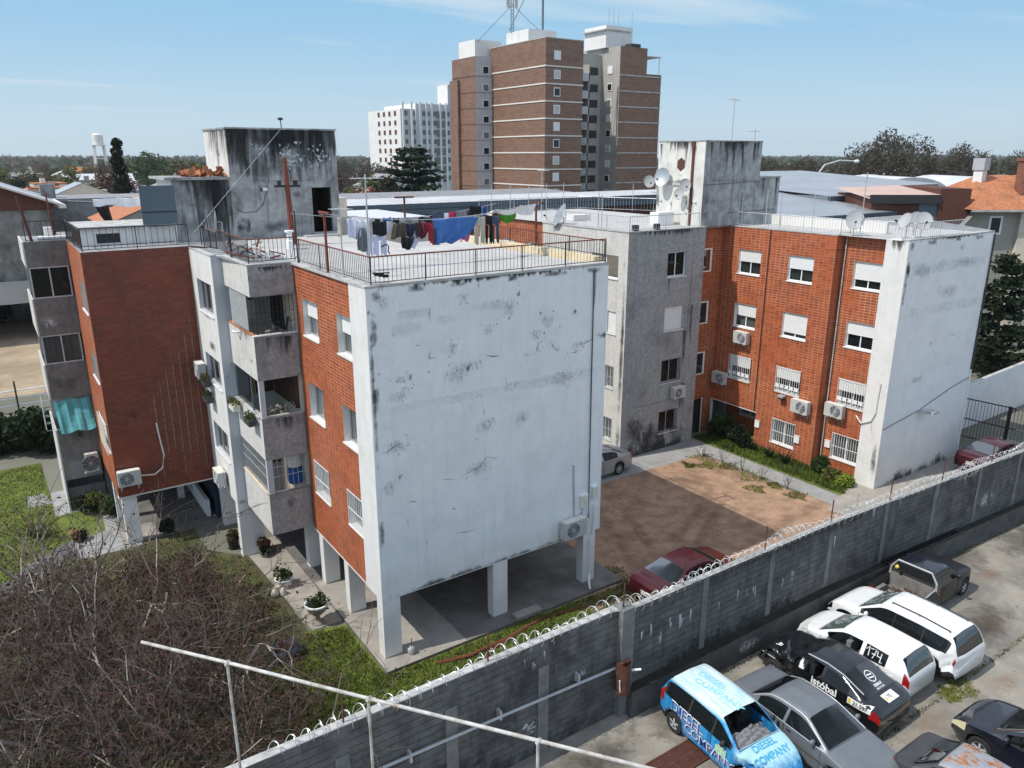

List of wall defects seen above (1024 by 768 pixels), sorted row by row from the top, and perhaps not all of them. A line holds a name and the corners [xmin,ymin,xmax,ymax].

leakage [208,129,333,176]
leakage [185,180,227,225]
leakage [629,421,680,456]